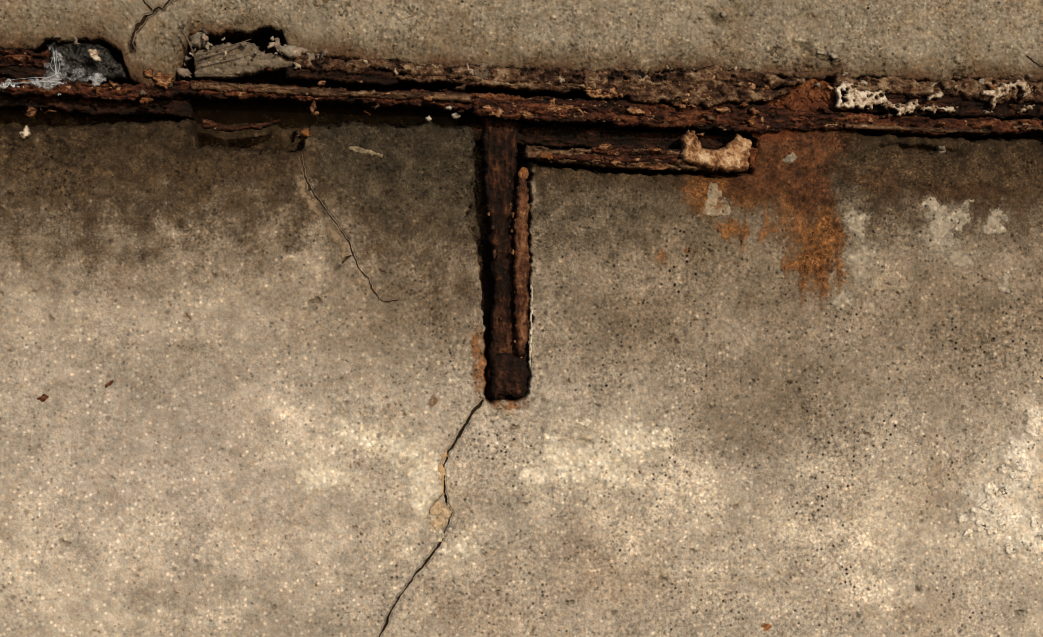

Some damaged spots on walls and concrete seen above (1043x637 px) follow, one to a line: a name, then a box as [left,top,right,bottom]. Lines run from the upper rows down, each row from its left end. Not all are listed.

corrosion [0,47,52,81]
spalling [88,49,101,62]
leakage [834,81,956,117]
leakage [980,78,1035,115]
spalling [19,125,31,139]
peeling [783,152,798,164]
crack [296,151,399,304]
corrosion [0,53,1043,410]
crack [378,399,485,637]